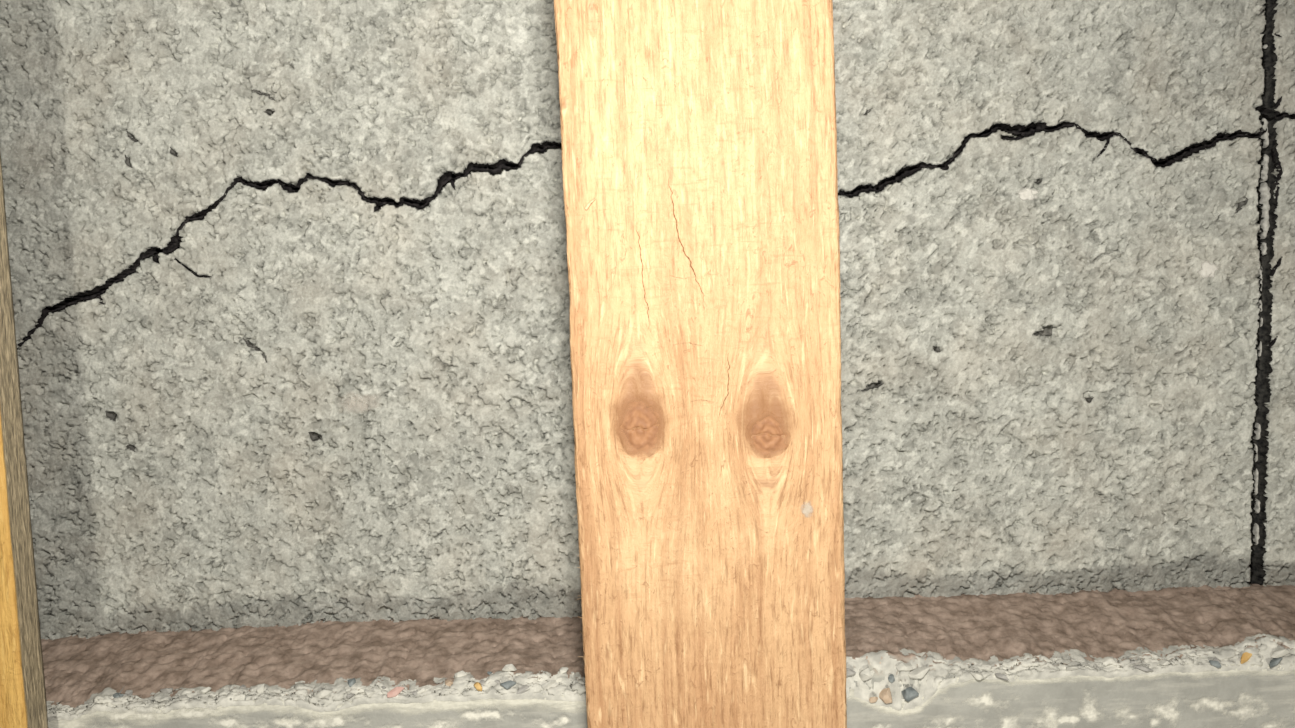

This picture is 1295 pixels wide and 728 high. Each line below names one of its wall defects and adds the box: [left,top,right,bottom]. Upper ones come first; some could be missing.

crack [252,90,275,114]
crack [838,106,1295,197]
crack [17,141,562,350]
crack [243,338,267,362]